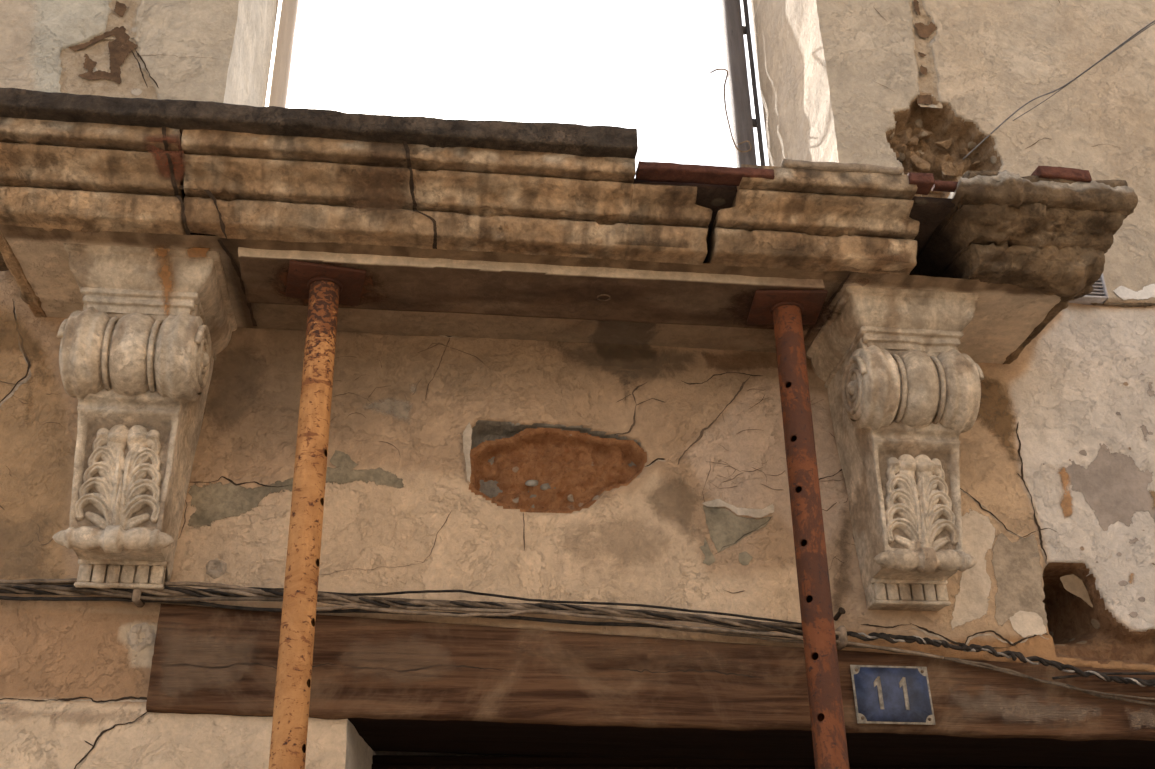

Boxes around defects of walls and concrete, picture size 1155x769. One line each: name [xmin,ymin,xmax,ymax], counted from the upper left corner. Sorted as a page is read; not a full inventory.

crack [402,141,437,249]
crack [0,299,61,425]
crack [178,476,288,539]
peeling [188,478,293,528]
peeling [326,450,404,488]
spalling [463,420,647,514]
crack [614,372,784,502]
peeling [699,499,774,565]
crack [960,423,1052,561]
peeling [1064,443,1155,556]
peeling [951,509,1155,667]
crack [0,696,150,769]